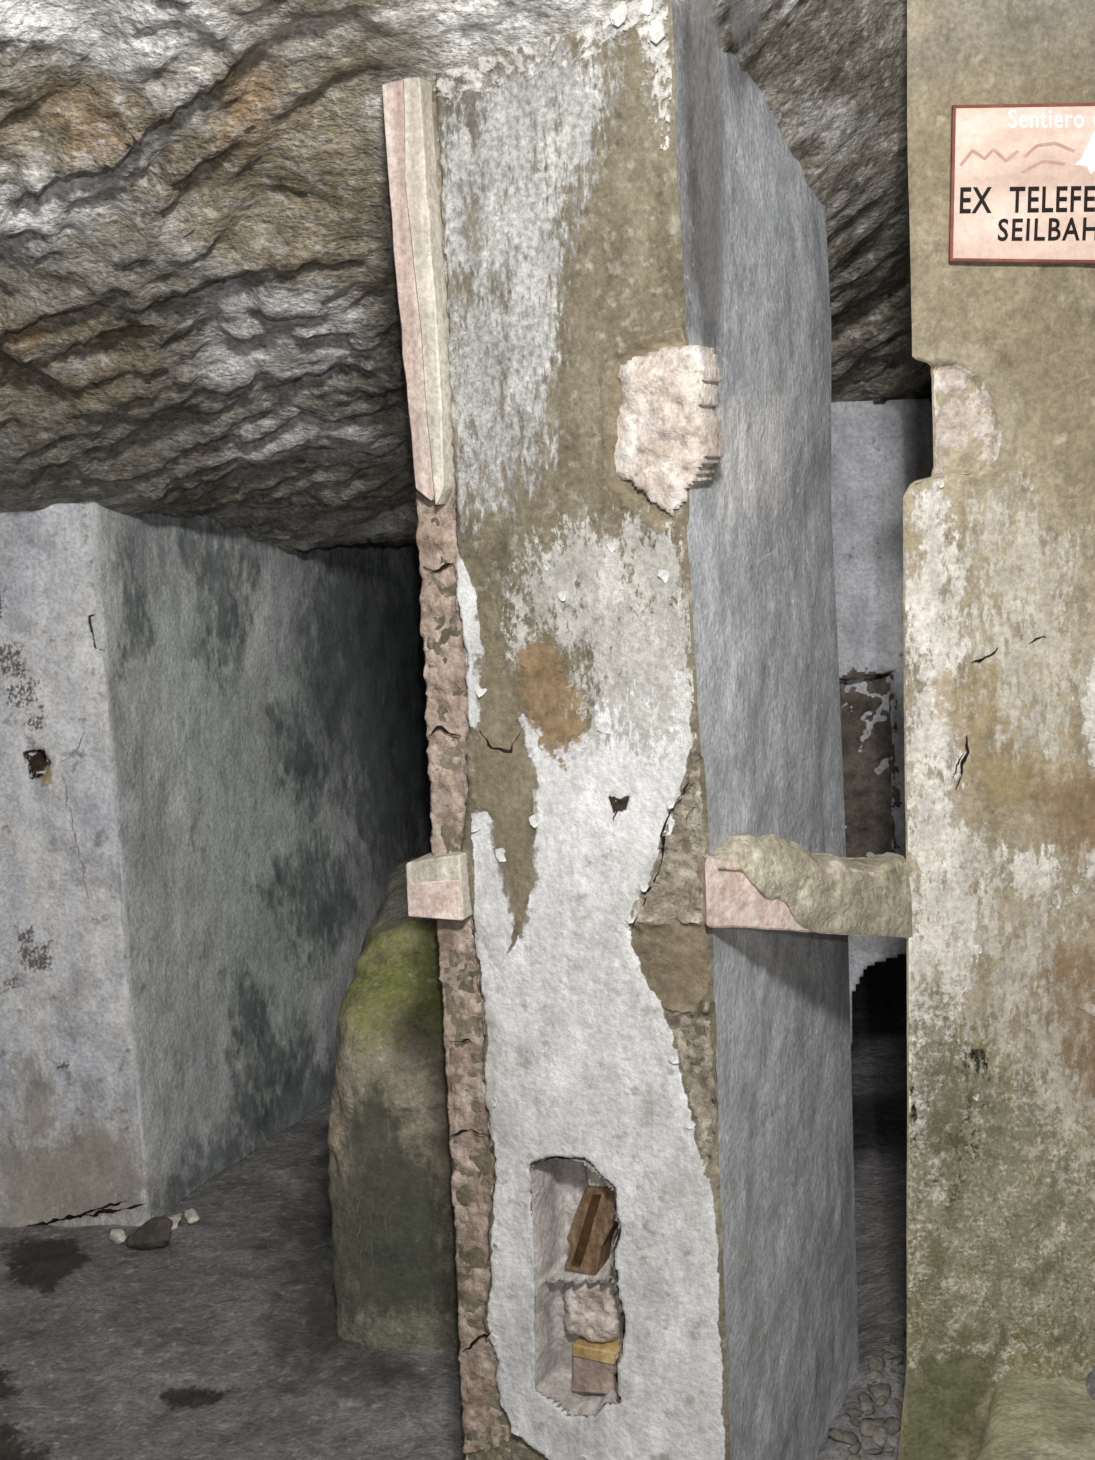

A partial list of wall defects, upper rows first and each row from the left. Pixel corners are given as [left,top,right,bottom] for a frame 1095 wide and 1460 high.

peeling [416,326,725,1460]